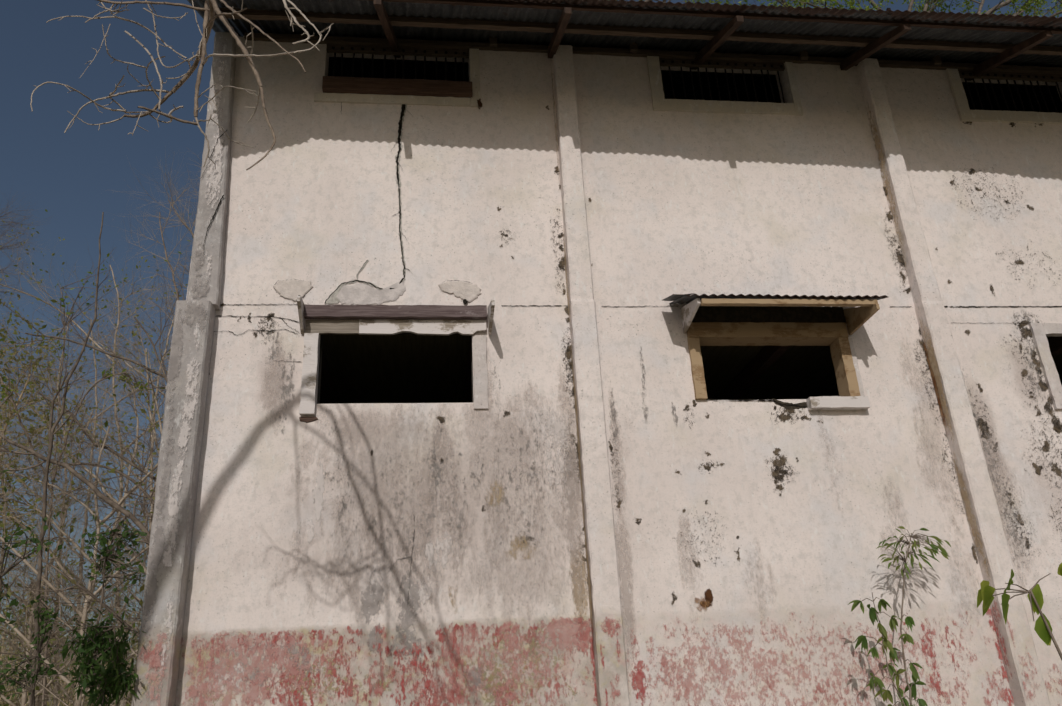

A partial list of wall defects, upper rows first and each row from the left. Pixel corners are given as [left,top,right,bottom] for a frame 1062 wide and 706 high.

peeling [140,242,212,705]
water stain [237,313,294,403]
flaking render [325,281,406,305]
crack [325,104,410,303]
flaking render [438,280,481,304]
water stain [506,208,580,490]
flaking render [707,398,808,409]
mould [883,177,911,294]
mould [950,167,1034,221]
water stain [1004,312,1062,540]
peeling [182,570,977,706]
peeling [984,601,1062,706]